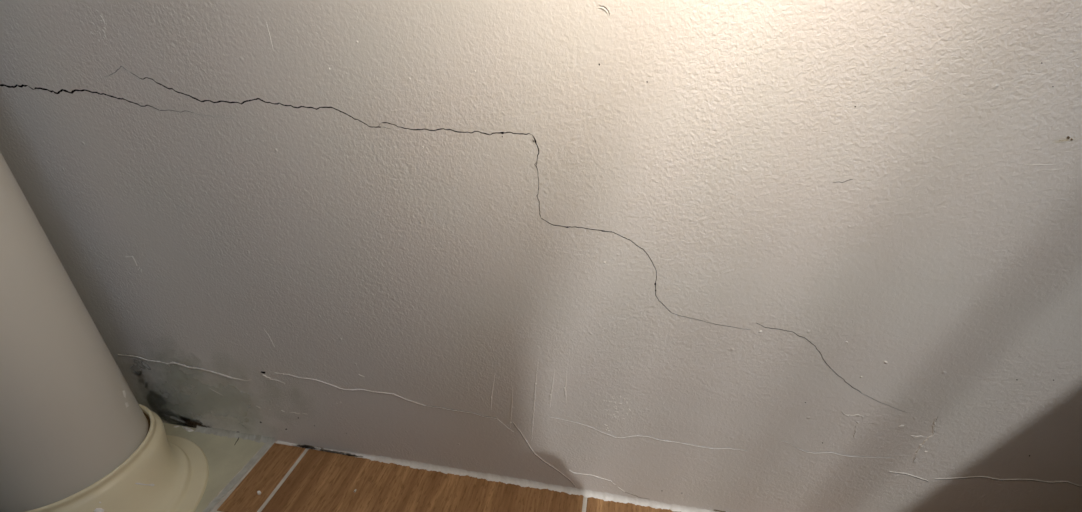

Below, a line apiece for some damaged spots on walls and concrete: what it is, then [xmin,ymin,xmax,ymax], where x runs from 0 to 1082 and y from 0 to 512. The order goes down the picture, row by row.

crack [0,66,907,413]
crack [276,373,648,499]